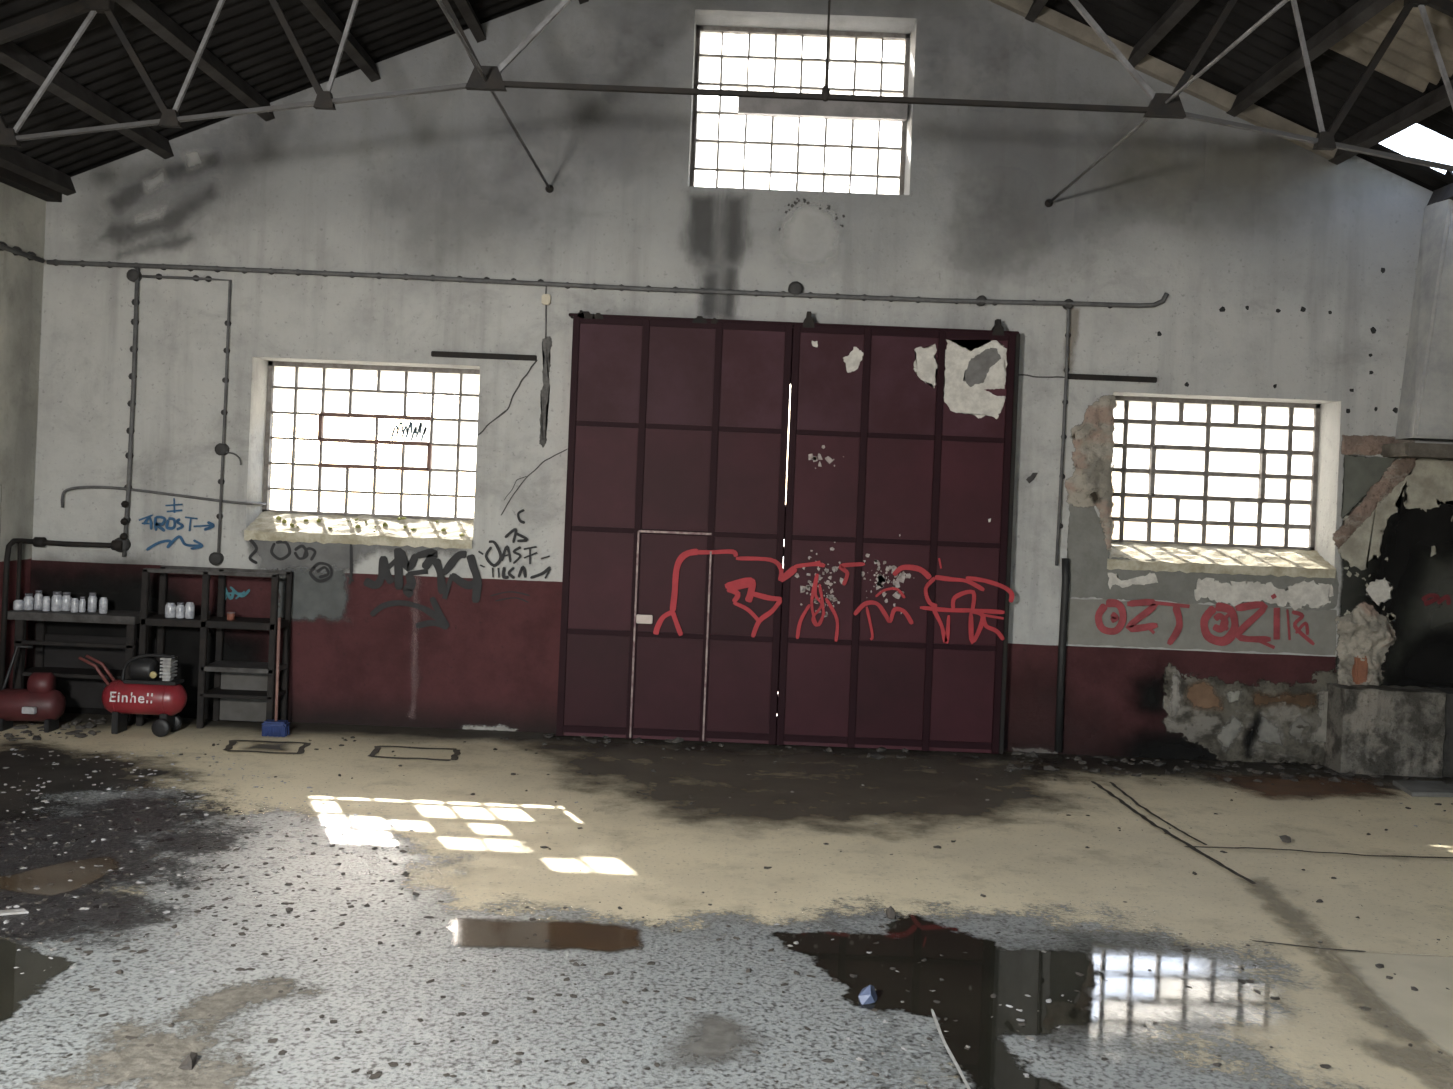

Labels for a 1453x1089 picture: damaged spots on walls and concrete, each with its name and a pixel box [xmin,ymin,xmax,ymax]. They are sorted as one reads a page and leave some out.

peeling [843,347,864,373]
peeling [914,339,1008,419]
spalling [1065,395,1117,550]
spalling [1162,435,1453,765]